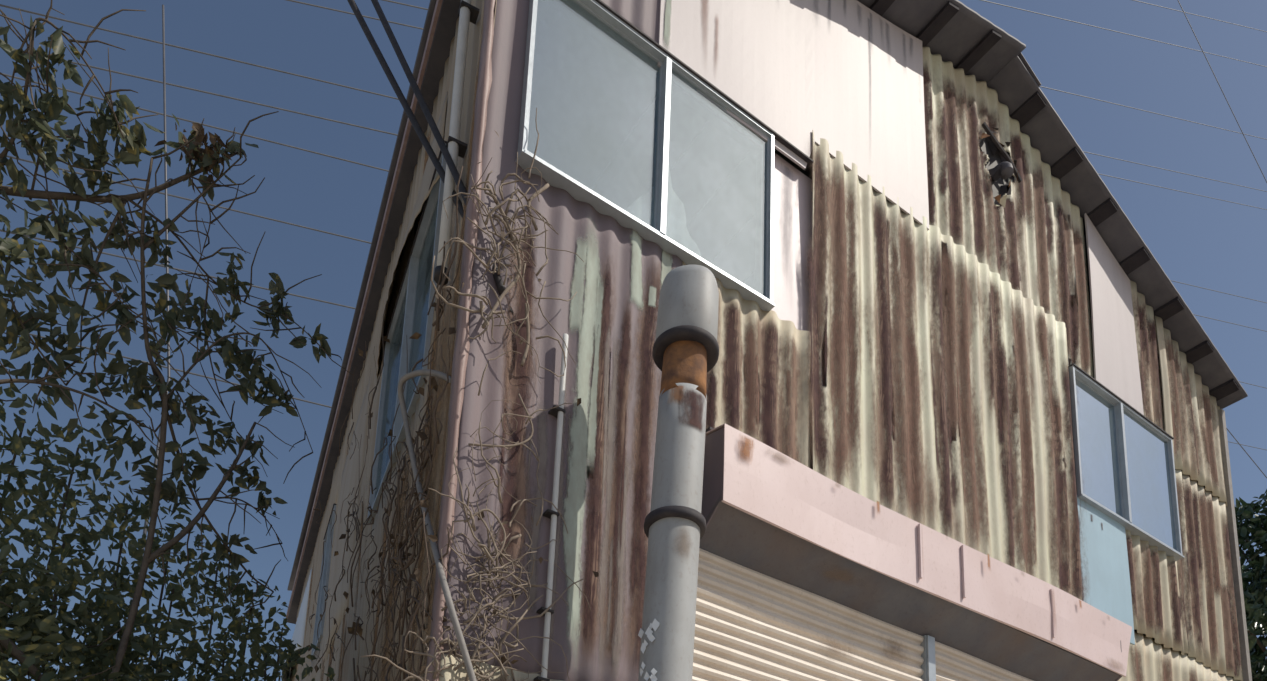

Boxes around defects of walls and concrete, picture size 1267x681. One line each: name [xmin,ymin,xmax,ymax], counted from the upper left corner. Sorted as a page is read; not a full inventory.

peeling [981,127,1018,208]
rust [580,271,660,660]
rust [671,70,1103,607]
rust [1136,306,1219,485]
rust [1163,661,1173,681]
rust [1126,481,1241,675]